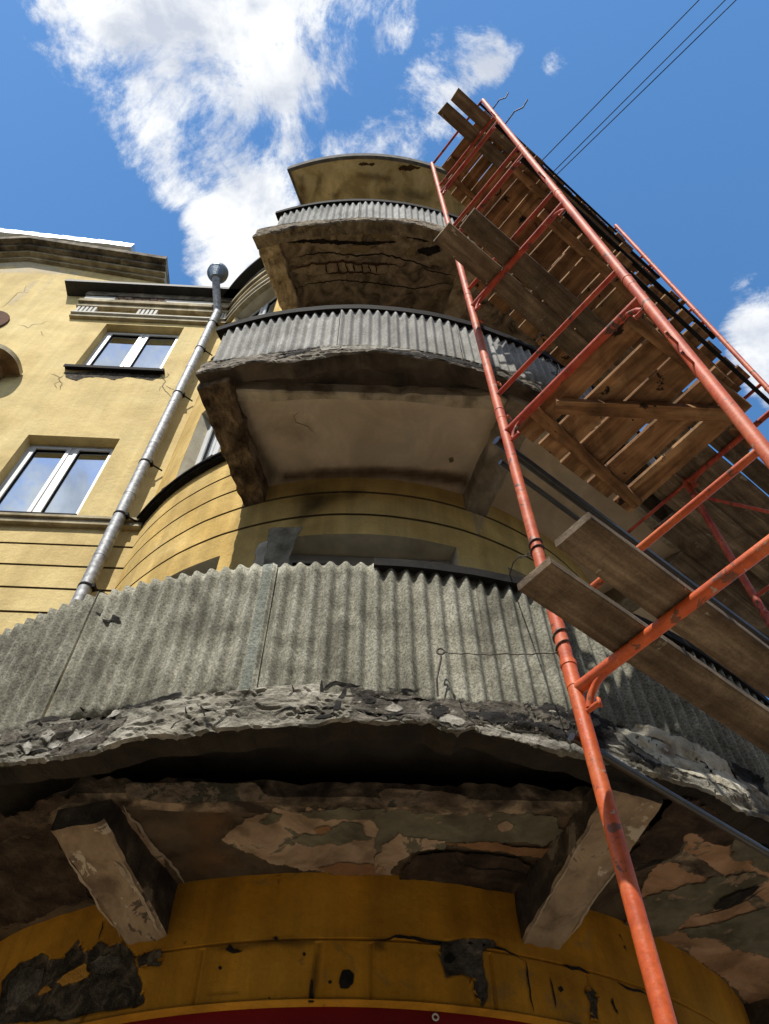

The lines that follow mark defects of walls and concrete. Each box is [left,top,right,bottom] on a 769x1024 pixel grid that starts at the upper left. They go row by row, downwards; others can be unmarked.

spalling [23,692,182,756]
spalling [349,648,584,753]
spalling [590,711,662,770]
spalling [731,761,768,796]
spalling [630,798,735,872]
peeling [0,795,164,1024]
spalling [714,881,768,910]
peeling [436,935,496,1007]
crack [375,935,590,1010]
crack [612,982,647,1013]